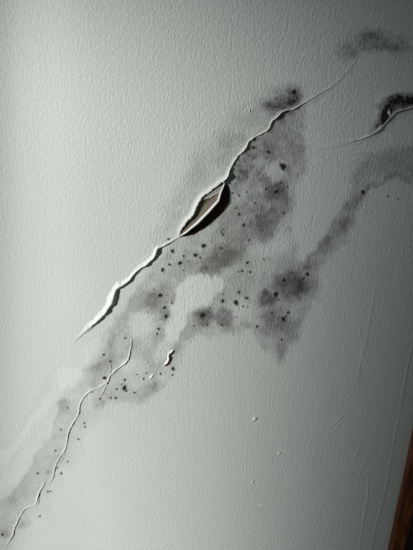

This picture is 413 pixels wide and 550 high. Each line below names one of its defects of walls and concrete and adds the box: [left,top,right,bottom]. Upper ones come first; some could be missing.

crack [222,61,356,185]
crack [318,104,413,150]
crack [73,236,179,343]
peeling [171,174,229,238]
damp [88,80,413,413]
damp [0,313,135,550]
crack [6,339,132,546]